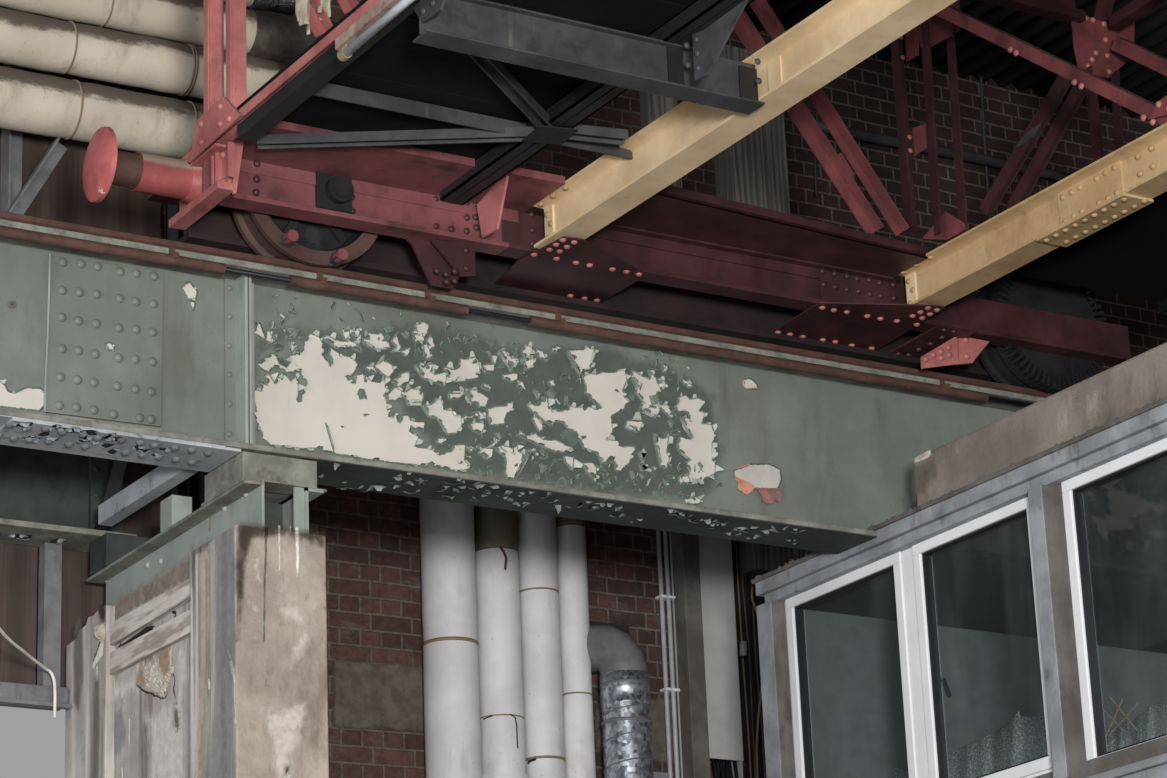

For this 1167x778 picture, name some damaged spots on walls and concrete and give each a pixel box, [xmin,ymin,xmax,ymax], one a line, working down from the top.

peeling [0,379,173,458]
peeling [252,320,805,545]
spalling [140,648,174,697]